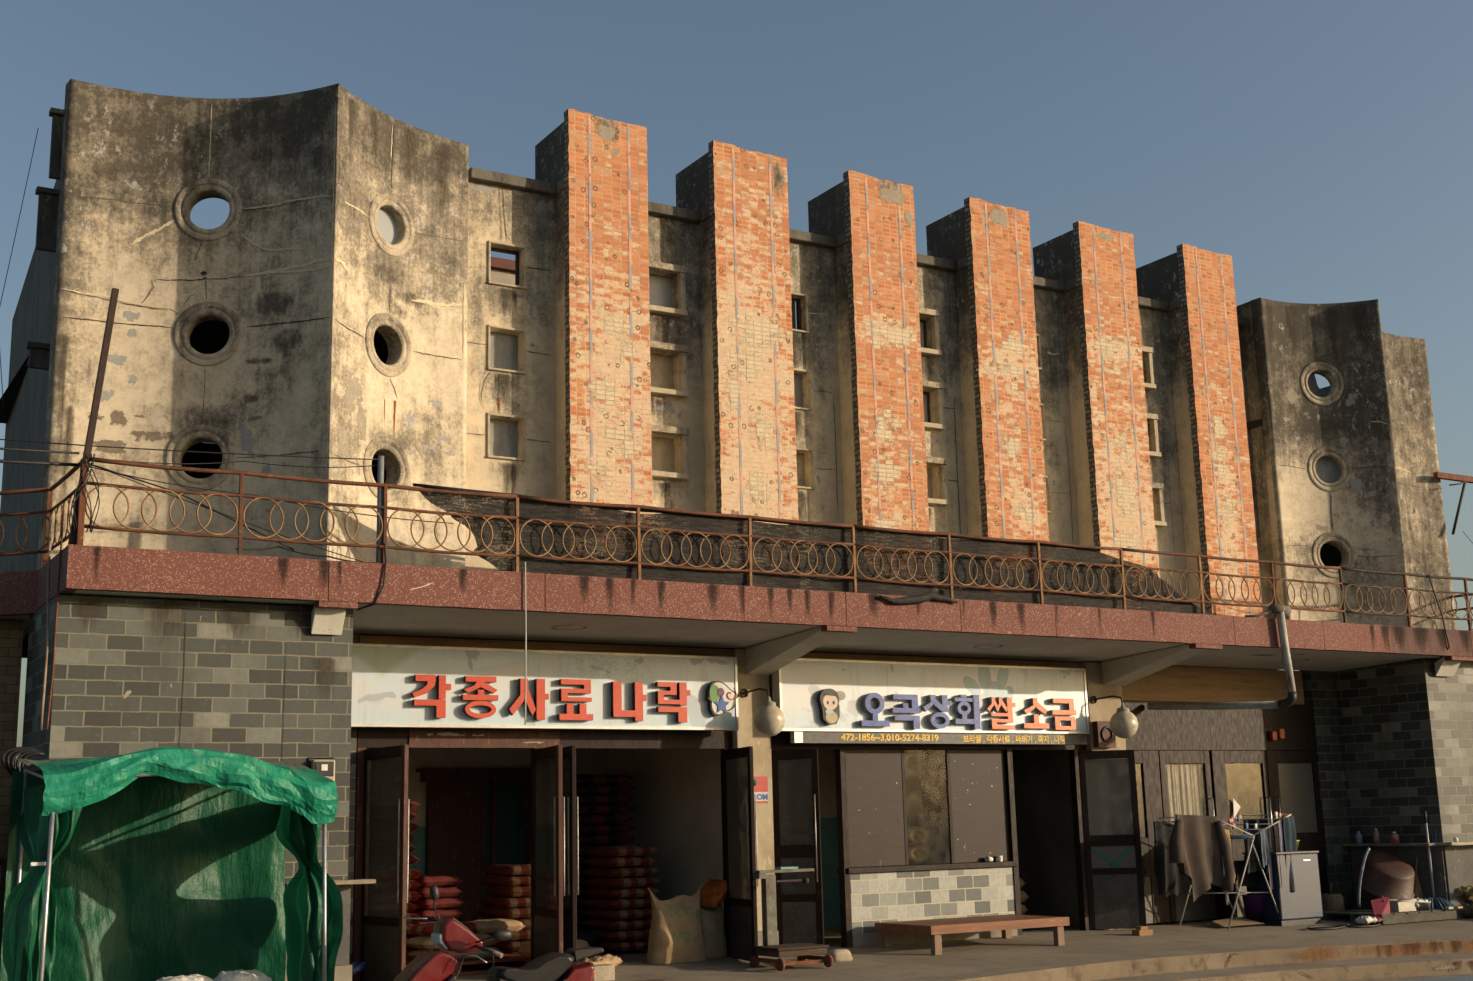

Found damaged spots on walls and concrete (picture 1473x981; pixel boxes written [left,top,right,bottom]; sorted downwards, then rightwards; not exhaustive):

water stain [437,142,449,202]
peeling [878,188,913,227]
crack [65,102,551,466]
water stain [377,265,424,316]
peeling [123,311,140,337]
water stain [247,292,302,364]
peeling [88,353,173,454]